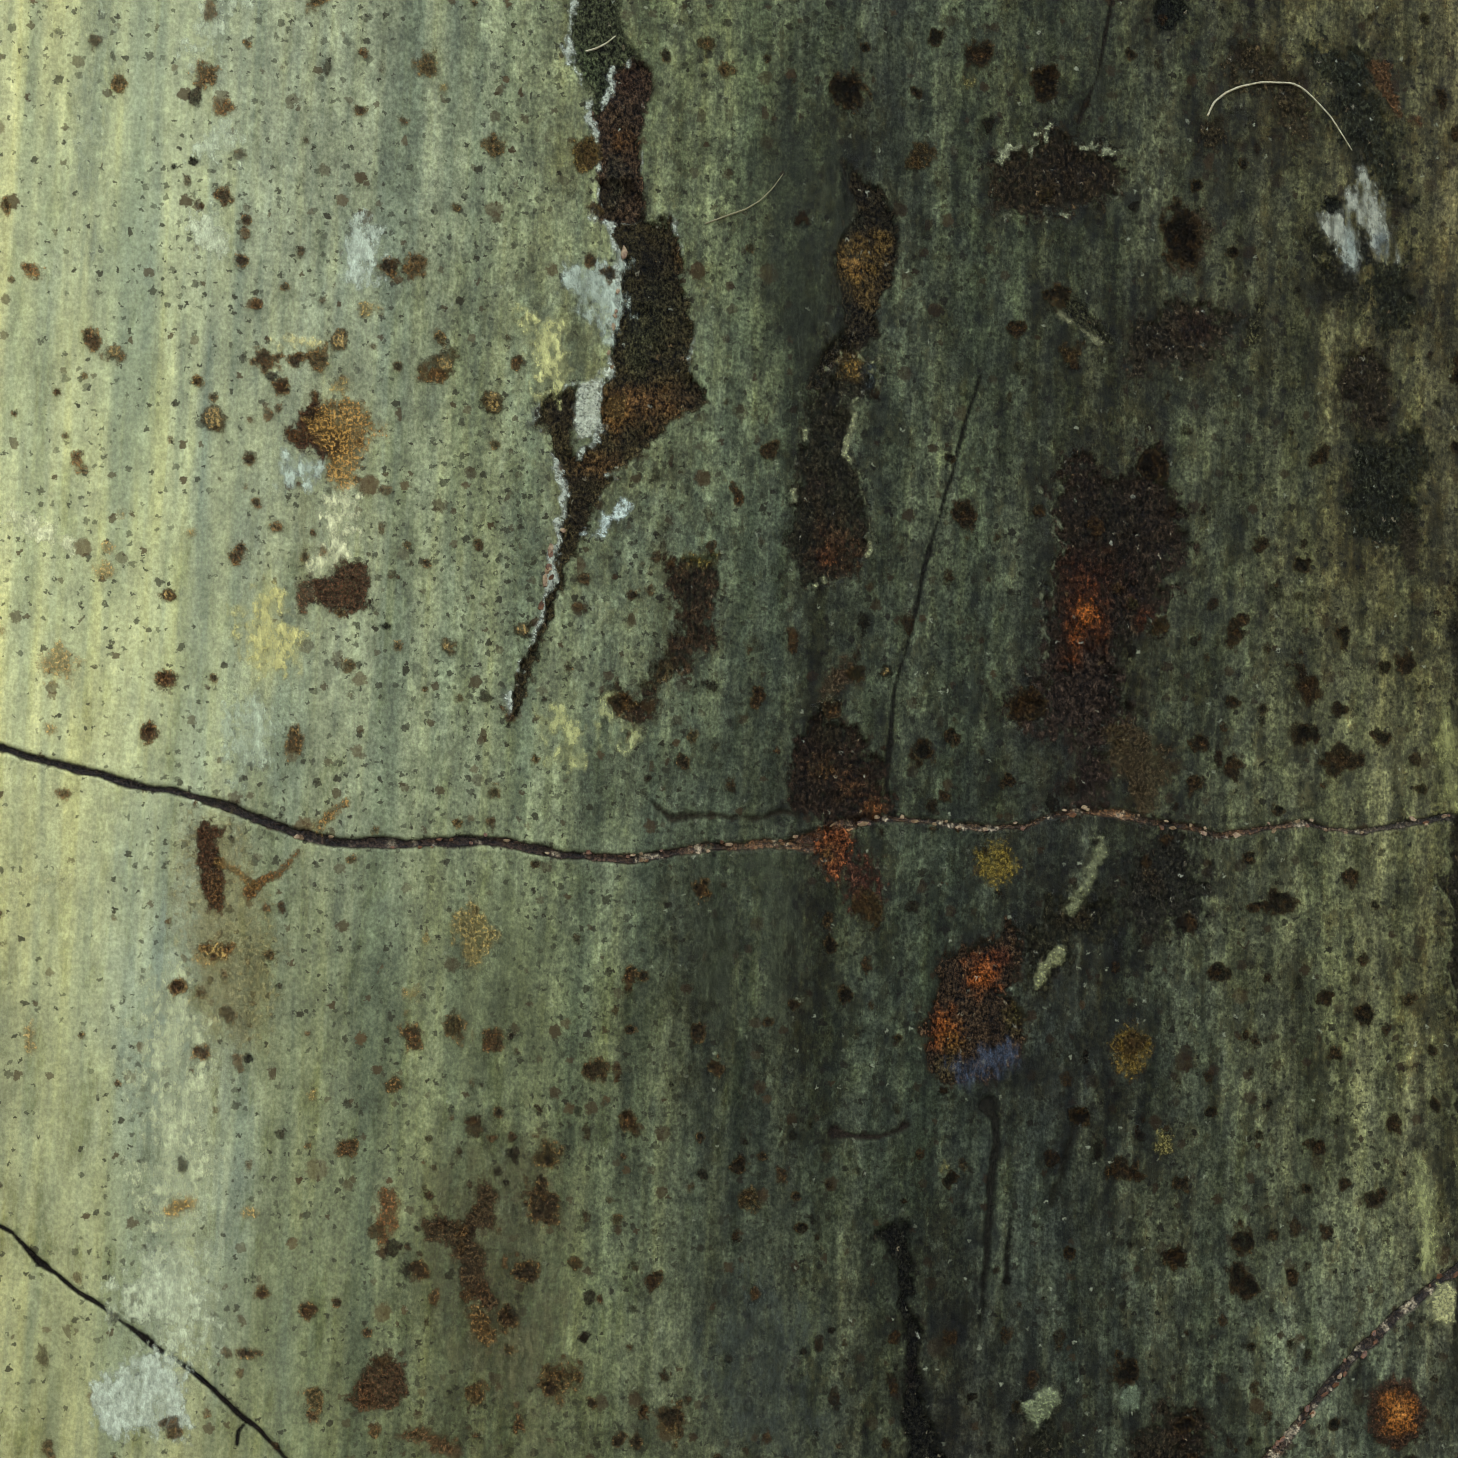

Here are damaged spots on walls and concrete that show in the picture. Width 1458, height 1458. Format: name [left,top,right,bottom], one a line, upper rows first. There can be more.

corrosion [242,451,282,532]
corrosion [247,282,290,310]
corrosion [192,301,387,489]
spalling [505,0,710,717]
spalling [782,157,900,590]
spalling [600,541,726,744]
crack [0,375,1458,864]
corrosion [193,801,300,915]
crack [0,1224,287,1458]
corrosion [158,1415,183,1439]
crack [1262,1262,1458,1458]
corrosion [1367,1373,1438,1458]